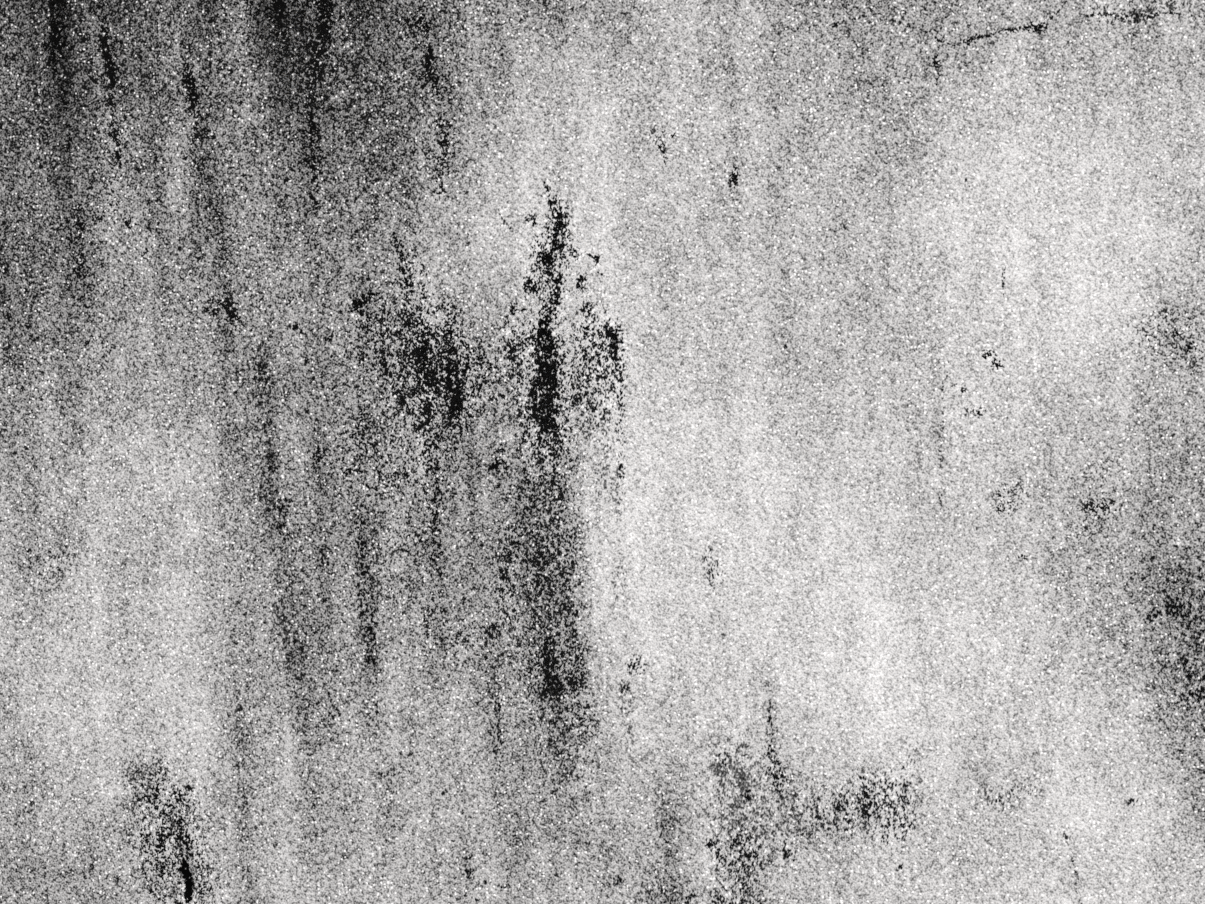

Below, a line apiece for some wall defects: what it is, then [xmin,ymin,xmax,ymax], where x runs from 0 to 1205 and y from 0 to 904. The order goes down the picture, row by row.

damp [59,84,71,167]
damp [68,27,136,296]
damp [188,98,238,316]
damp [241,0,342,248]
crack [784,0,1205,85]
damp [1142,309,1202,368]
damp [252,335,308,755]
damp [310,181,626,795]
damp [620,655,646,729]
damp [1139,590,1205,725]